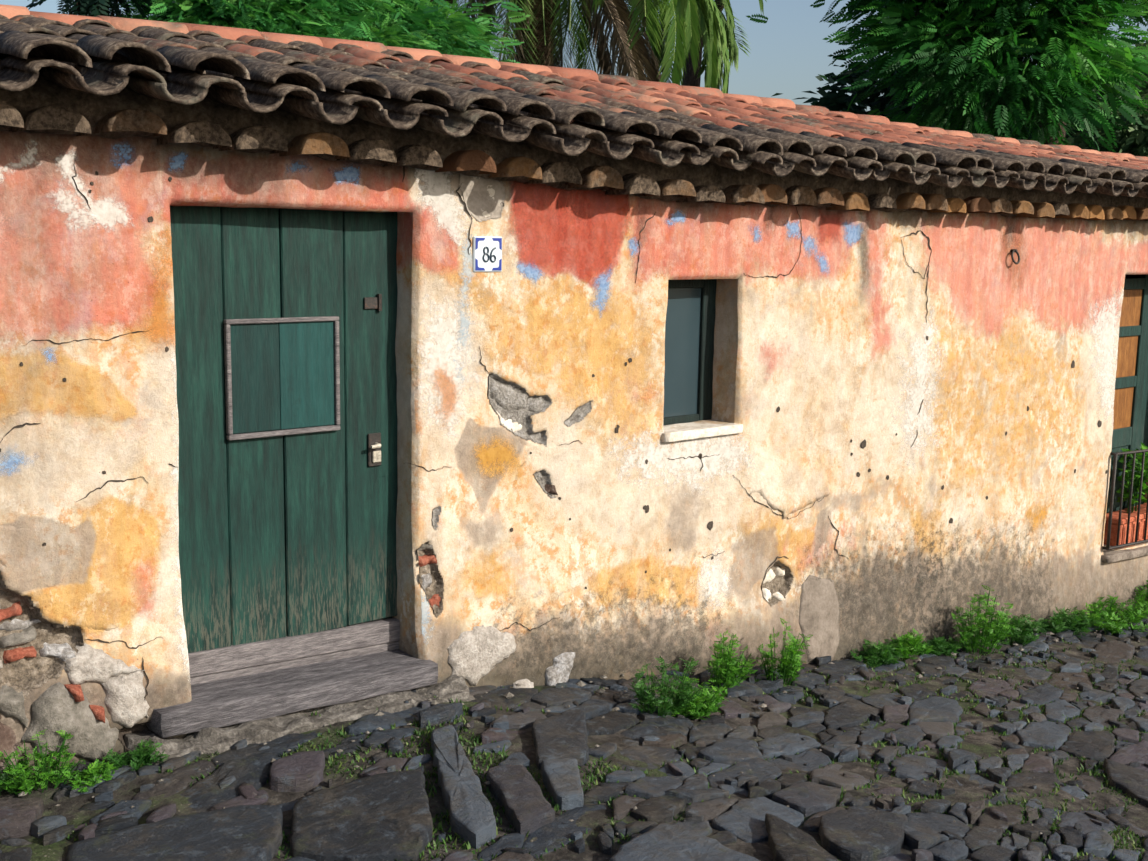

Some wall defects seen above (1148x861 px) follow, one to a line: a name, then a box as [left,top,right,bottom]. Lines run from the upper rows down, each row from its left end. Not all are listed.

flaking render [414,168,561,500]
crack [901,230,932,323]
crack [0,423,41,443]
crack [76,477,148,502]
flaking render [165,347,179,541]
crack [668,455,846,557]
flaking render [0,508,160,700]
crack [85,637,164,699]
flaking render [175,557,190,672]
flaking render [416,505,444,635]
flaking render [761,560,794,606]
water stain [811,506,1049,660]